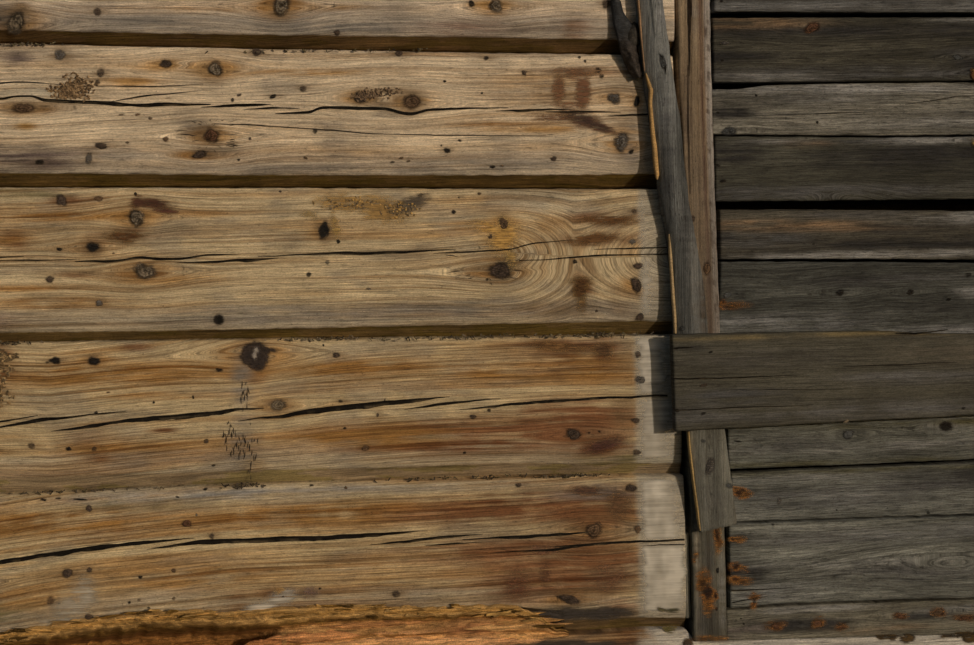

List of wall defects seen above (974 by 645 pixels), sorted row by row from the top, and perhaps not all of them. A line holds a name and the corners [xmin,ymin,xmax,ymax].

crack [0,81,648,152]
crack [651,0,692,194]
crack [0,374,816,431]
crack [0,531,685,564]
peeling [0,609,240,644]
peeling [321,604,399,619]
peeling [496,609,565,628]
corrosion [693,553,718,614]